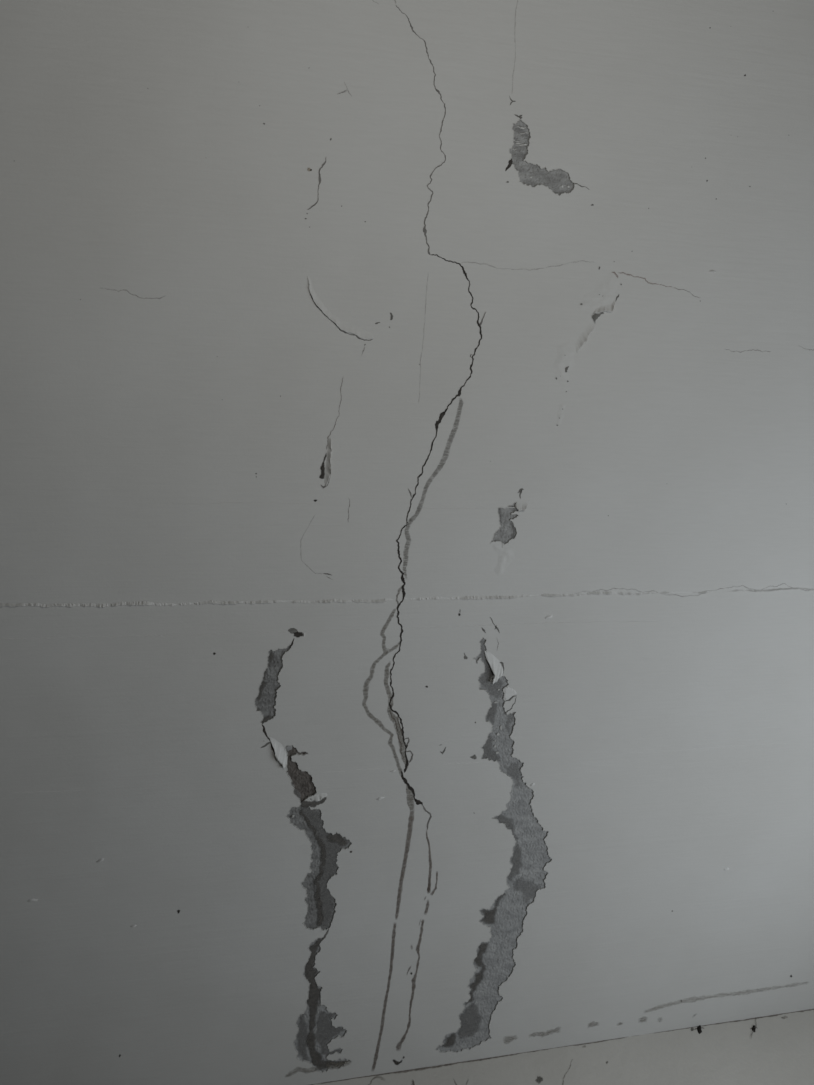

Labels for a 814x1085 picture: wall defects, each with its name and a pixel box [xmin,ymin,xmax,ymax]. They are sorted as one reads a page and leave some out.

peeling [505,98,588,196]
crack [389,6,486,830]
peeling [491,488,530,576]
peeling [254,628,352,1073]
peeling [435,617,552,1053]
crack [310,1037,625,1085]
crack [656,1009,814,1033]